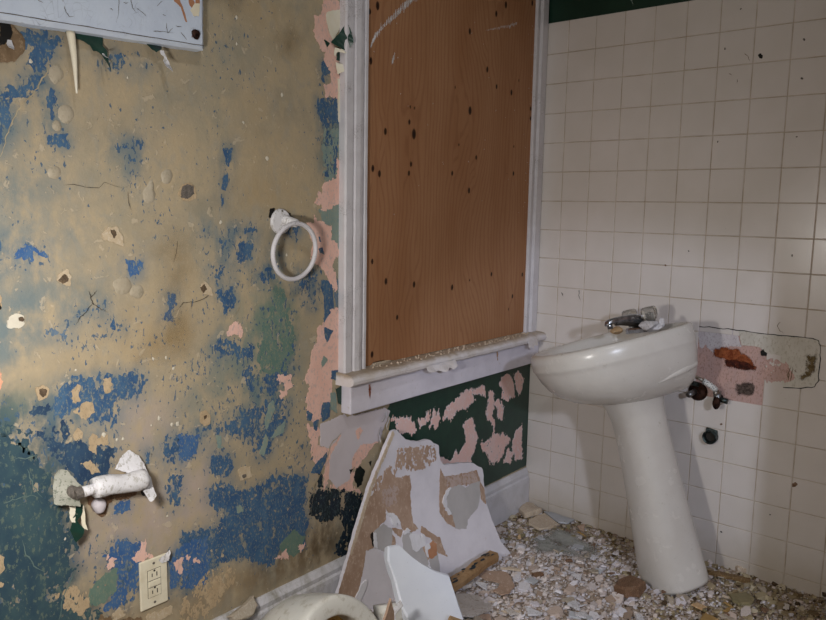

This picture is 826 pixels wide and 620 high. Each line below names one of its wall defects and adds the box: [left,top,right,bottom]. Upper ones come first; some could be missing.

spalling [0,23,25,63]
peeling [65,32,111,70]
peeling [147,44,173,72]
peeling [331,25,354,75]
peeling [0,74,45,144]
flaking render [178,183,197,201]
flaking render [7,313,25,329]
flaking render [96,372,112,393]
peeling [695,327,766,405]
flaking render [71,384,109,474]
peeling [379,371,525,465]
flaking render [55,566,236,620]